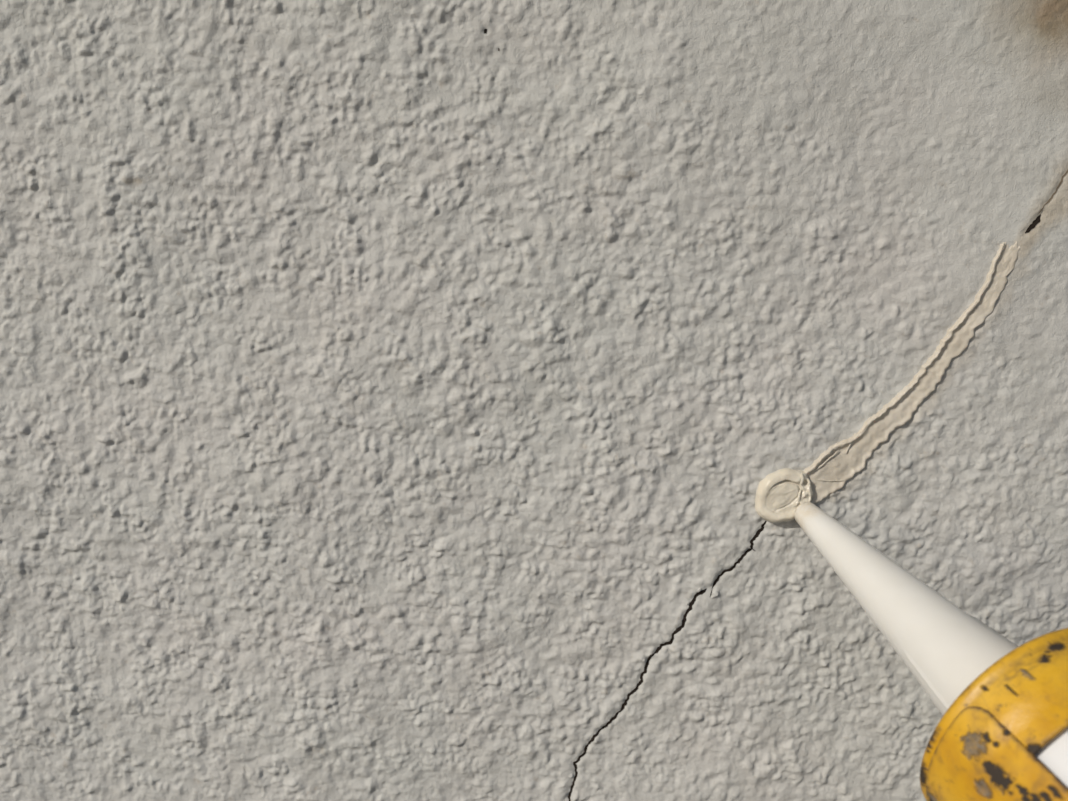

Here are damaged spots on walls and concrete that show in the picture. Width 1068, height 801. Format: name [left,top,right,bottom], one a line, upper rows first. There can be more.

crack [1025,169,1068,233]
crack [568,521,767,801]